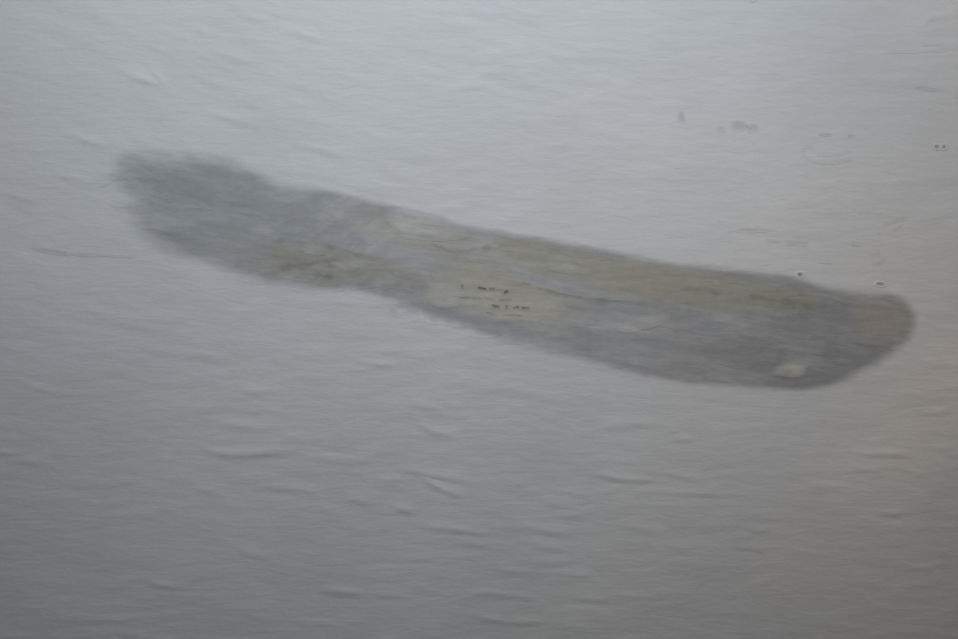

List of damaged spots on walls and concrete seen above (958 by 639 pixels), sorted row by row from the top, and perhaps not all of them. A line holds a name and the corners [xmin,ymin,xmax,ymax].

leakage [94,145,921,394]